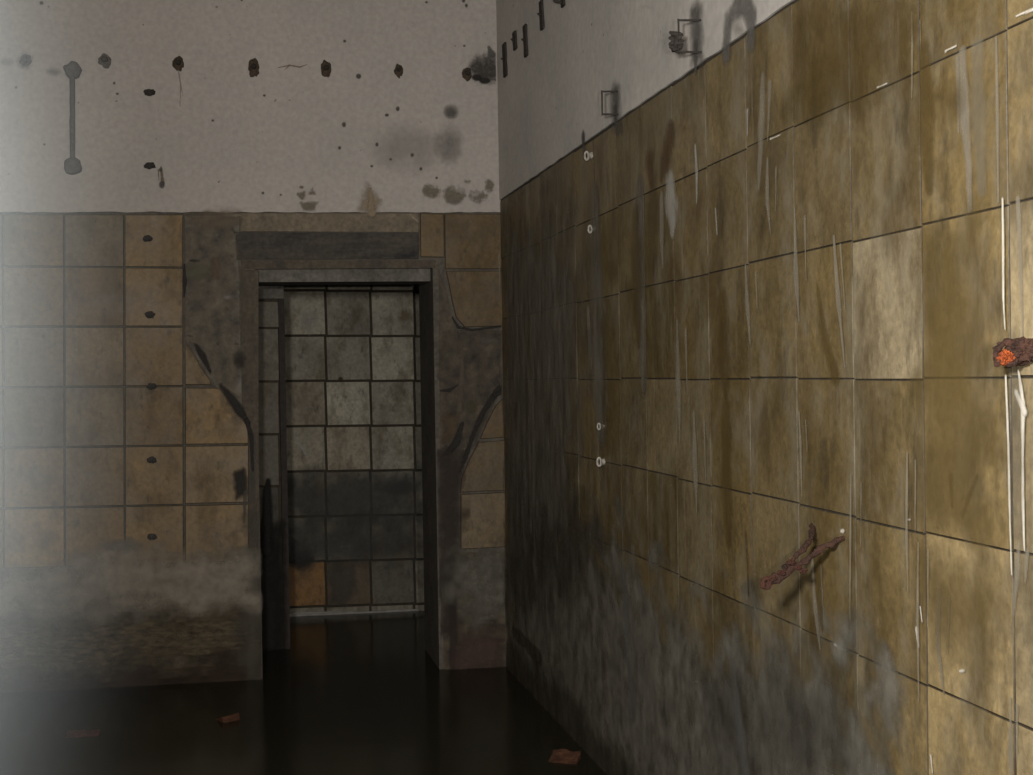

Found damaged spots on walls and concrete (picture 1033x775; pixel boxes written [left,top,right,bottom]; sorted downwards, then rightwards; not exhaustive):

crack [181,264,189,297]
crack [452,316,501,331]
corrosion [992,342,1016,367]
crack [195,344,254,471]
crack [444,385,502,469]